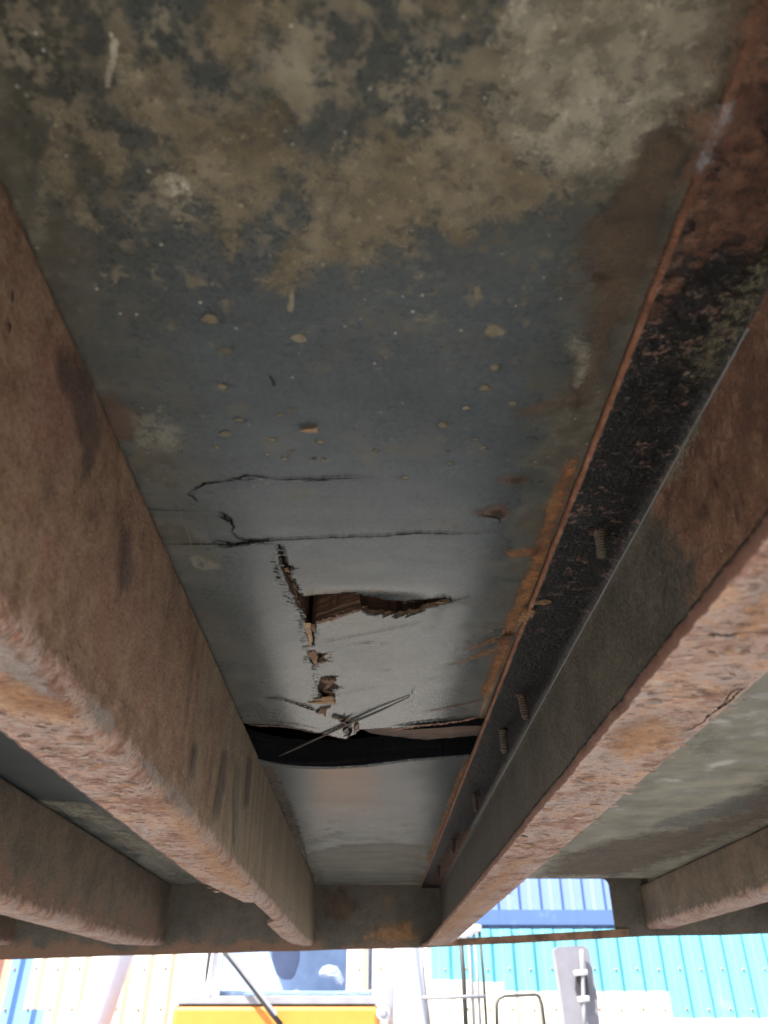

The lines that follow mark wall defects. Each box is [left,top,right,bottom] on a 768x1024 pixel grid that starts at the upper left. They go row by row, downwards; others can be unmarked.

damp [106,38,119,86]
damp [507,131,686,416]
crack [148,475,499,548]
corrosion [451,459,578,713]
crack [249,697,368,734]
crack [393,687,484,731]